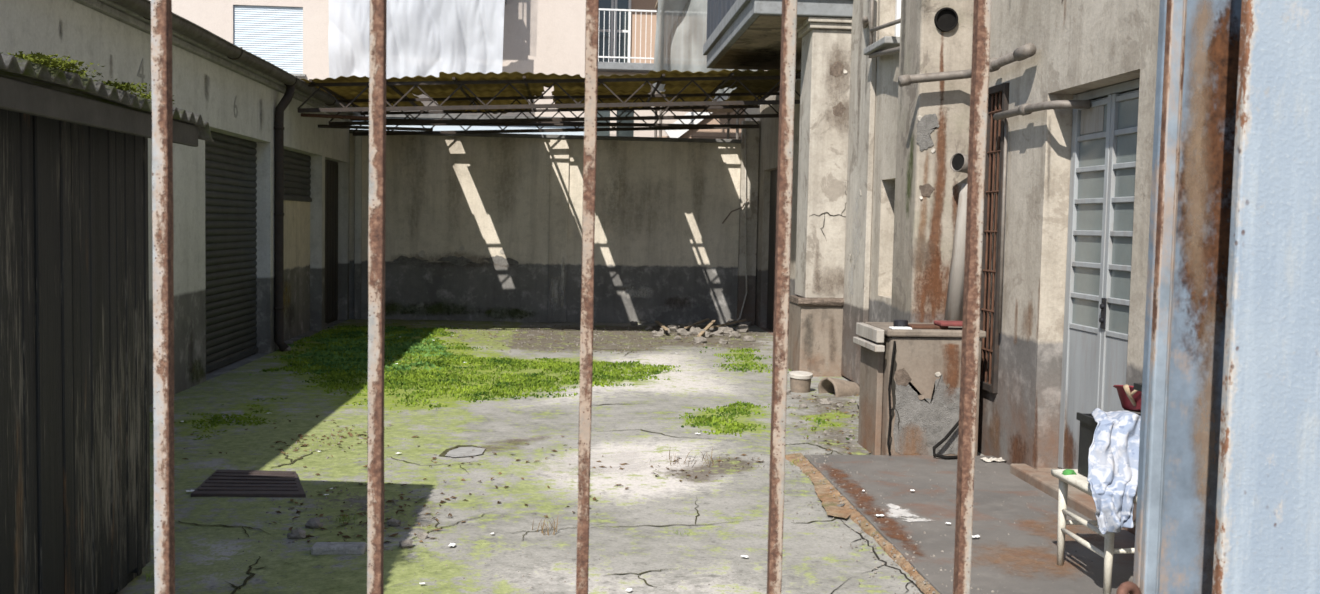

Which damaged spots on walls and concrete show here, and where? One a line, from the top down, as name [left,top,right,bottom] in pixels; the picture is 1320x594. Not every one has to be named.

spalling [916,114,939,153]
corrosion [914,31,959,323]
corrosion [1178,0,1240,594]
peeling [893,368,960,455]
crack [179,521,272,594]
crack [791,517,924,594]